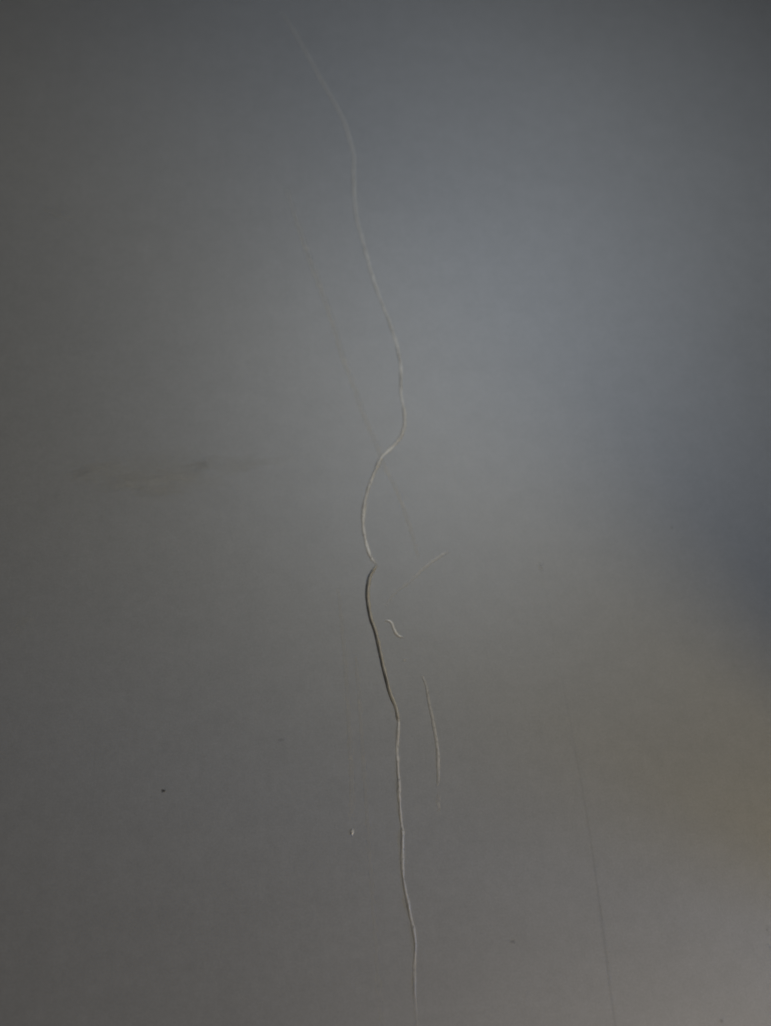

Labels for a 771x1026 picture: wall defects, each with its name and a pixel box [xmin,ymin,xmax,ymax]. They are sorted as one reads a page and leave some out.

crack [299,40,417,978]